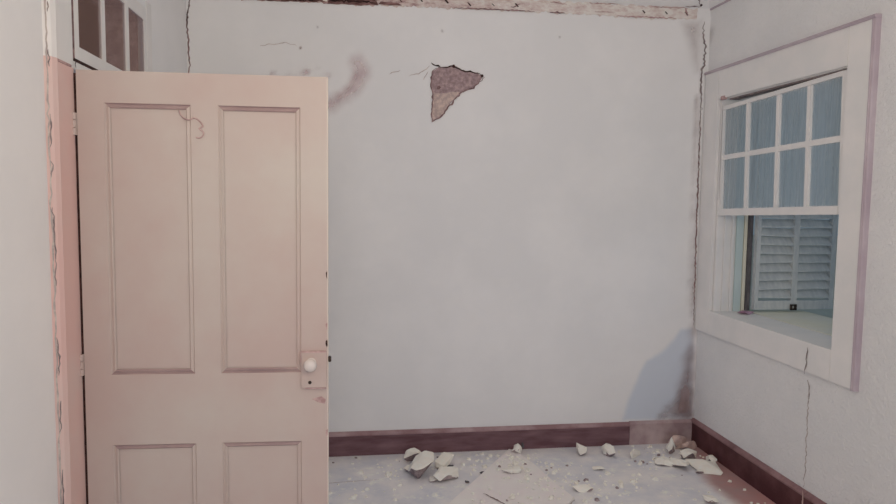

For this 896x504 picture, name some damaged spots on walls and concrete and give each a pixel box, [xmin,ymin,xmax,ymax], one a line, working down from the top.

crack [184,0,192,73]
peeling [412,63,485,122]
crack [686,0,707,325]
damp [619,324,697,422]
crack [802,348,810,504]